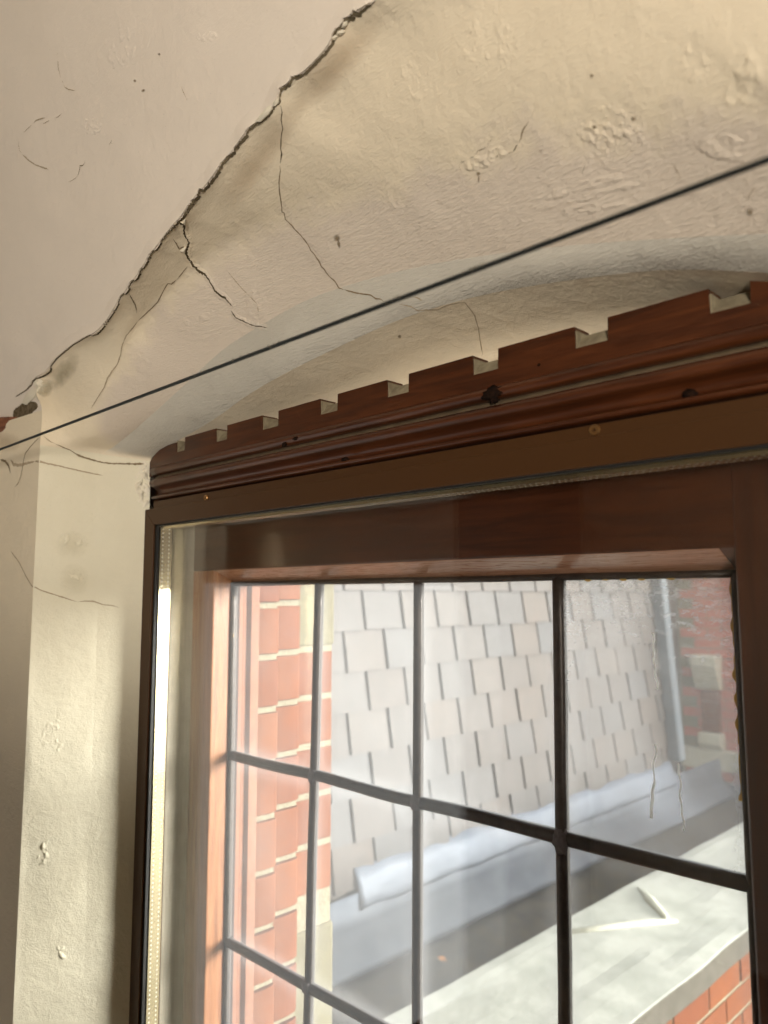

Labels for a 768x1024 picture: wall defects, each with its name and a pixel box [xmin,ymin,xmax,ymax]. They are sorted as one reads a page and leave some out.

crack [16,0,483,408]
crack [0,437,144,485]
crack [11,552,119,608]